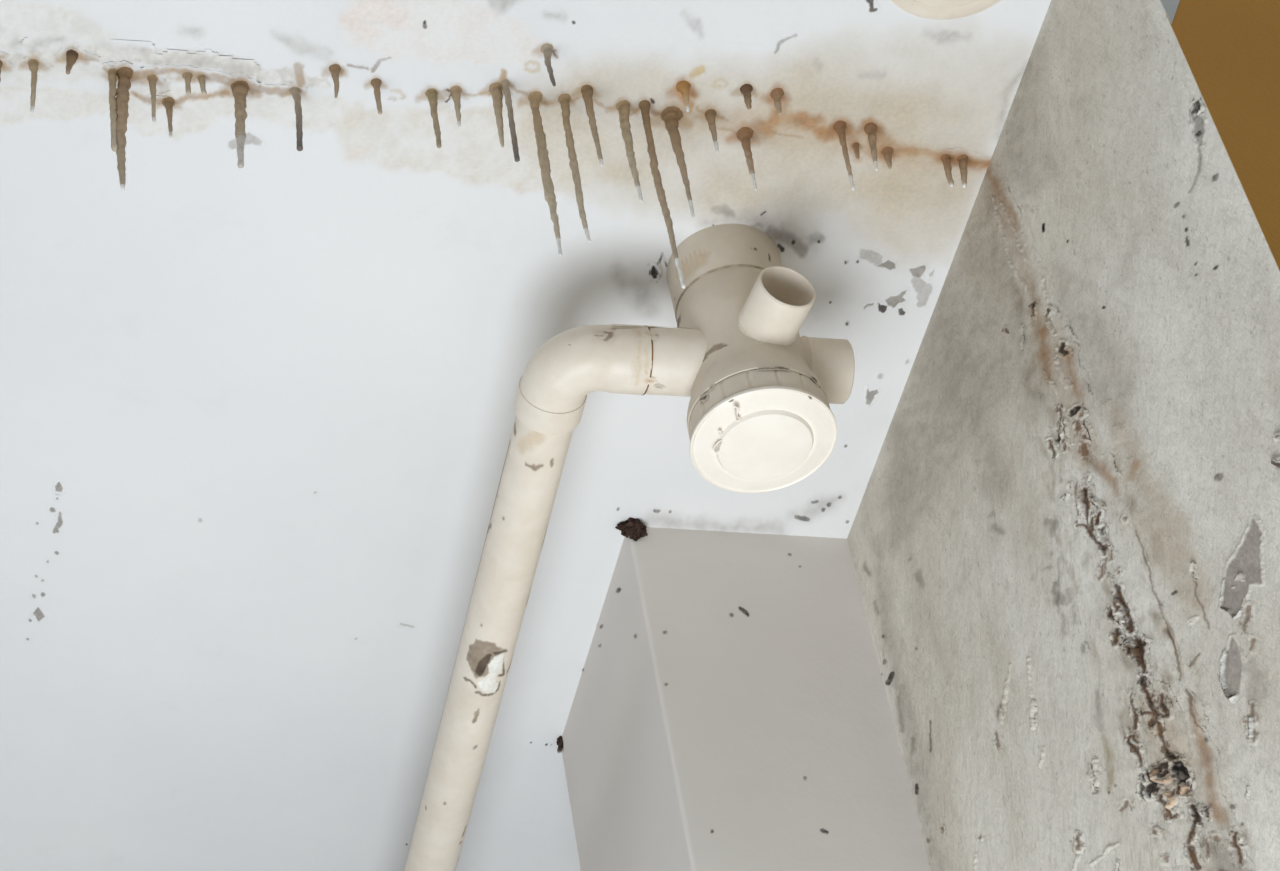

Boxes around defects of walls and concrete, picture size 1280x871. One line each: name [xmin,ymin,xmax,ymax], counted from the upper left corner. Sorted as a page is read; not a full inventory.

water stain [0,0,136,132]
water stain [127,0,1063,871]
peeling [863,370,887,408]
peeling [842,246,937,329]
corrosion [666,62,1221,627]
crack [1001,296,1075,360]
water stain [1042,212,1151,422]
water stain [1029,515,1090,657]
crack [1043,399,1212,773]
peeling [1217,514,1272,750]
corrosion [1125,680,1236,830]
spalling [1115,754,1255,871]